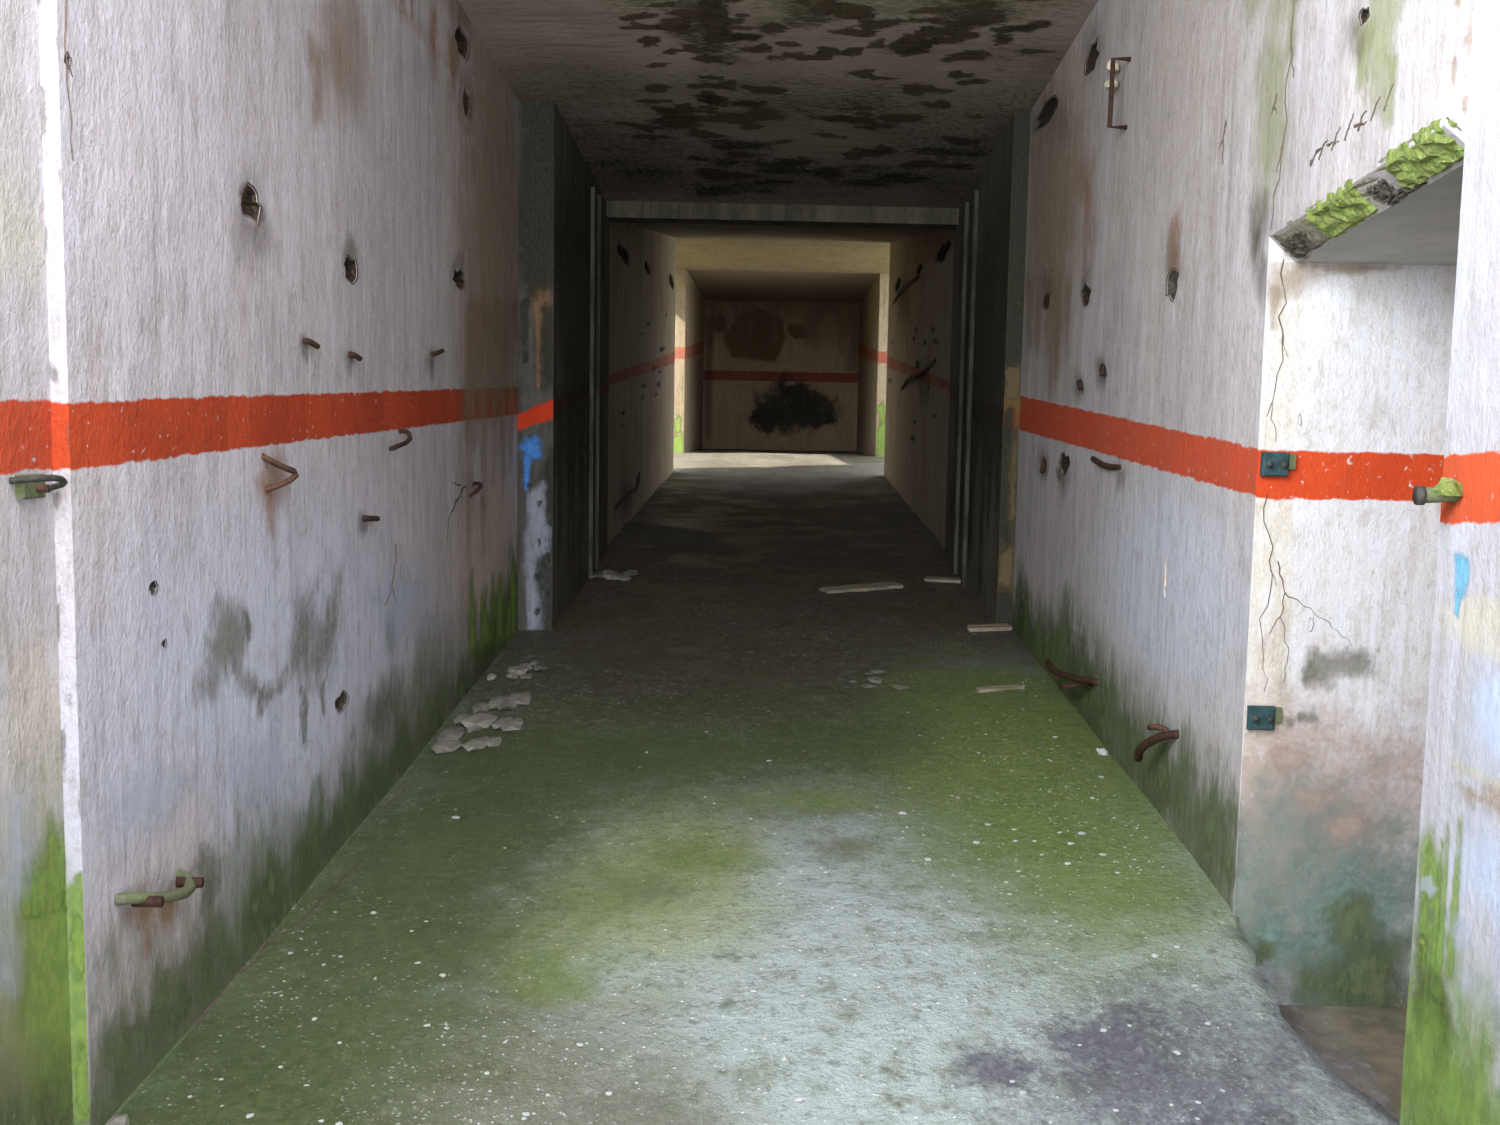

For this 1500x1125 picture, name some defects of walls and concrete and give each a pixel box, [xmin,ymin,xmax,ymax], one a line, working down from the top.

leakage [214,612,250,687]
leakage [293,606,336,743]
crack [1259,495,1351,691]
leakage [21,830,67,917]
leakage [105,851,228,1070]
leakage [1418,841,1459,978]
leakage [1402,1004,1486,1125]